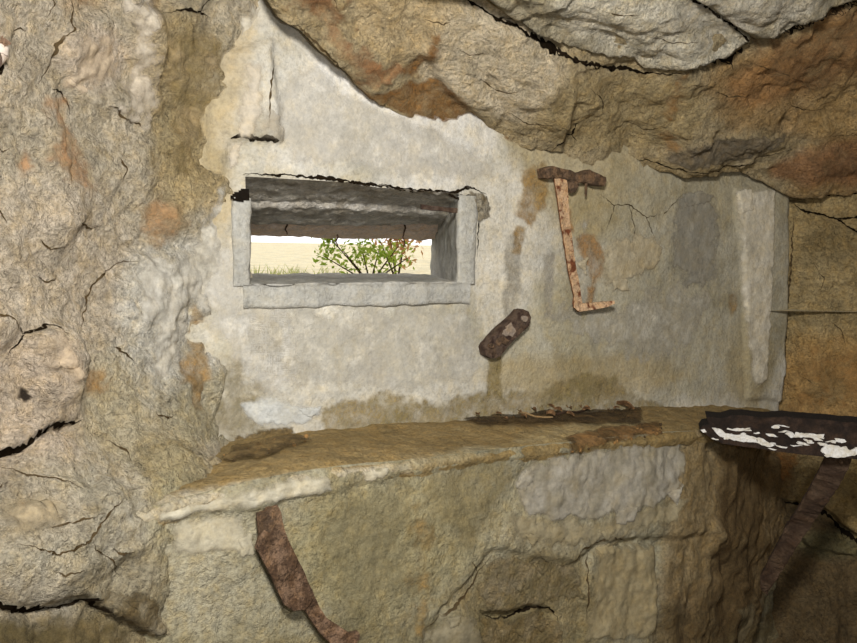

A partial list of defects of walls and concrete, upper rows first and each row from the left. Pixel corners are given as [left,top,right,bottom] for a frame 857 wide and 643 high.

crack [163,0,210,16]
crack [283,21,367,90]
crack [468,0,687,76]
crack [692,0,750,70]
crack [783,0,857,35]
crack [785,193,857,358]
crack [0,419,83,488]
crack [821,510,857,544]
crack [0,598,113,615]
crack [482,605,558,623]